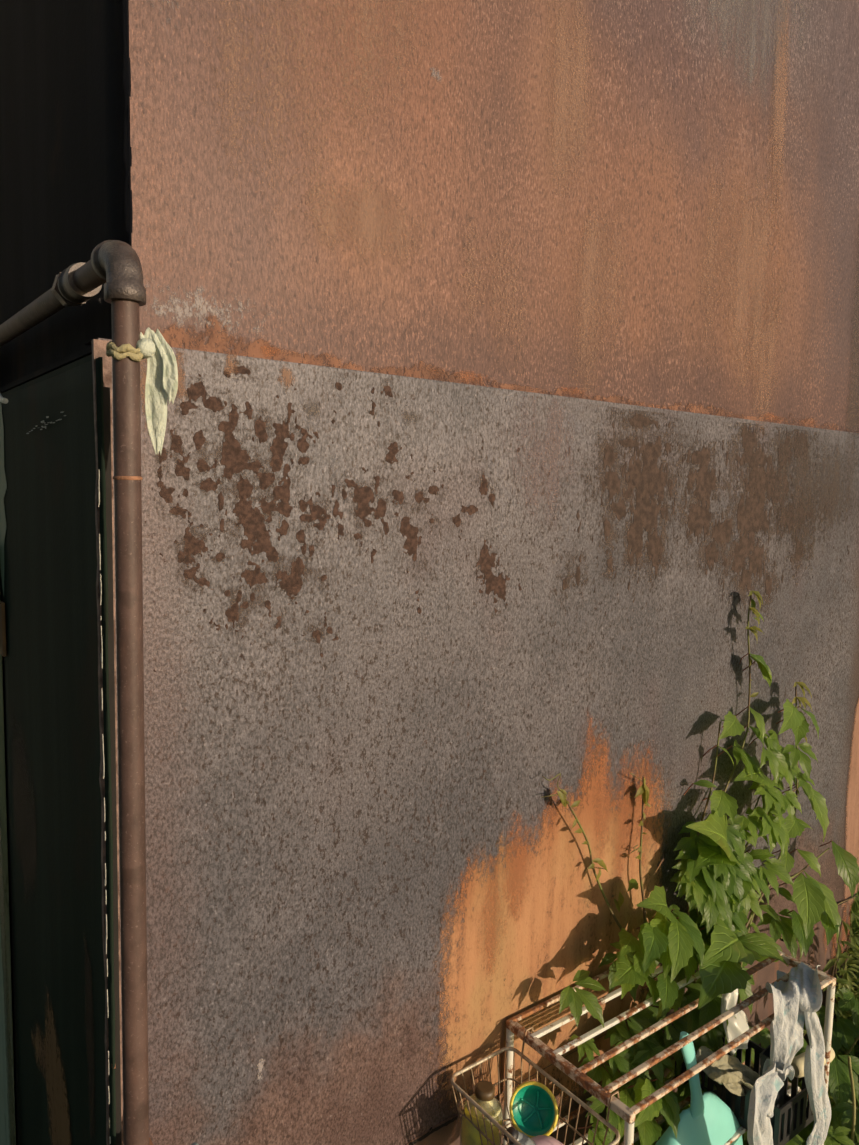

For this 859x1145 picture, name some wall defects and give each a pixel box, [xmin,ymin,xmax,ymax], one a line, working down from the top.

rust [160,315,850,431]
rust [435,721,670,1109]